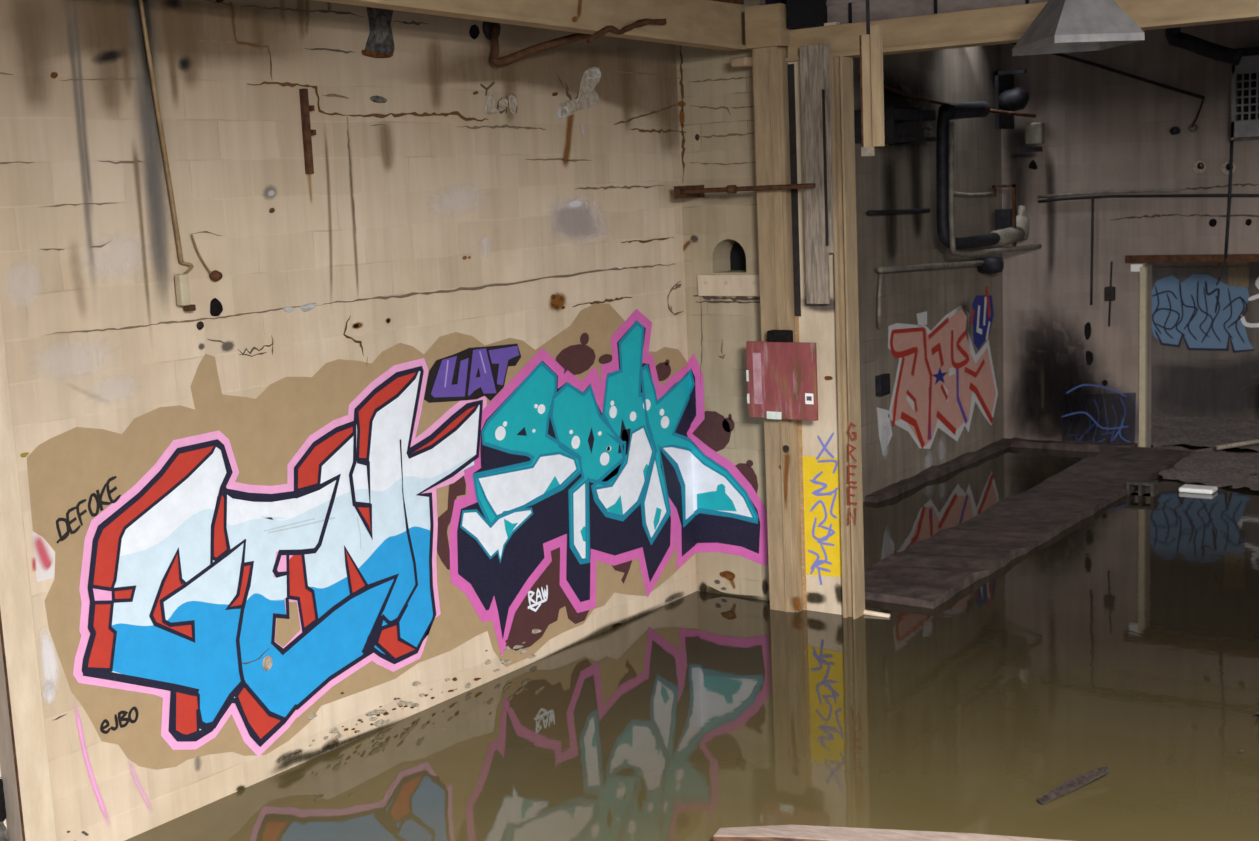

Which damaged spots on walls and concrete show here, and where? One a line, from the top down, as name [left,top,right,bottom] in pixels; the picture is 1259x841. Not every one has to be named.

damp [70,0,284,296]
crack [200,0,756,228]
damp [434,48,641,118]